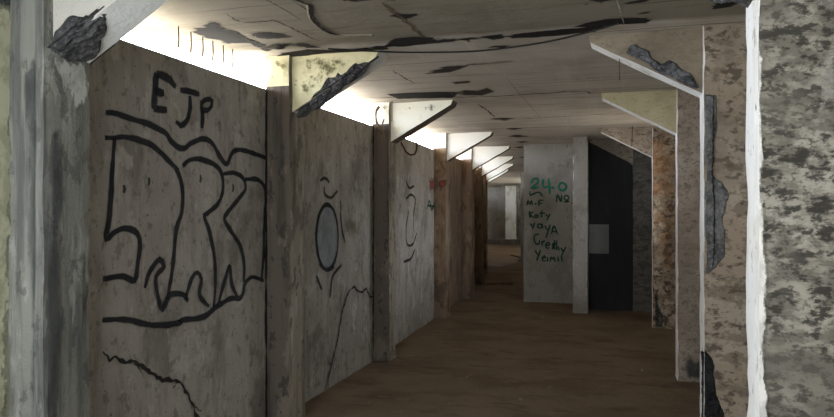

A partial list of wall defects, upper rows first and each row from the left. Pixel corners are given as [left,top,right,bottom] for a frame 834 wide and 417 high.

spalling [47,6,116,109]
spalling [296,56,379,118]
crack [227,0,653,57]
crack [385,70,623,120]
spalling [626,44,729,273]
crack [103,351,203,417]
spalling [701,350,724,417]